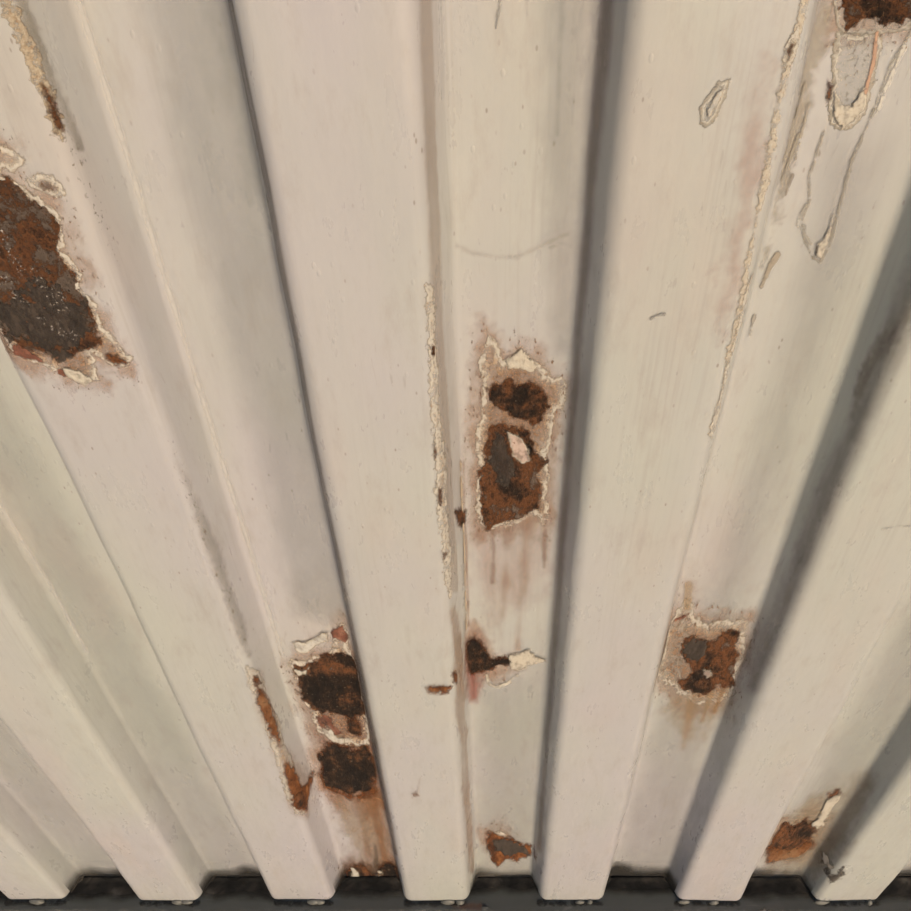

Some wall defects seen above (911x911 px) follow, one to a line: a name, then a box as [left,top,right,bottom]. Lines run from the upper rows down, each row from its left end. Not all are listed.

peeling [0,0,65,142]
rust [0,139,139,392]
peeling [708,0,830,438]
peeling [797,29,911,262]
rust [826,0,911,55]
peeling [424,282,467,630]
rust [464,324,570,542]
rust [246,613,400,879]
rust [466,634,546,693]
rust [485,819,536,866]
rust [654,582,759,720]
rust [766,789,845,883]